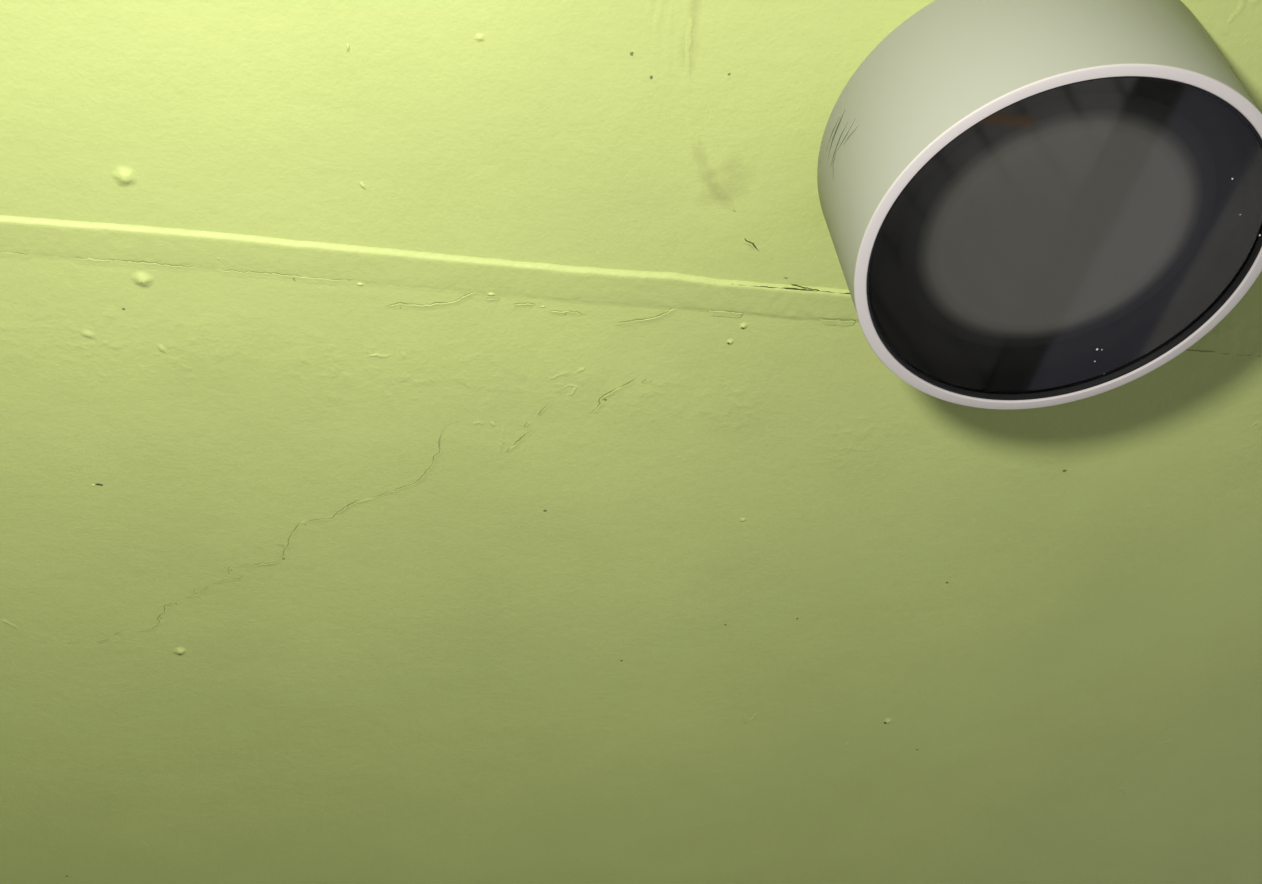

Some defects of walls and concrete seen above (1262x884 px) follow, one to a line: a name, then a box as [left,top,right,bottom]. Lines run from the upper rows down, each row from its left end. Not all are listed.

crack [743,238,760,252]
crack [70,257,678,327]
crack [709,277,856,326]
crack [588,378,653,414]
crack [67,421,458,645]